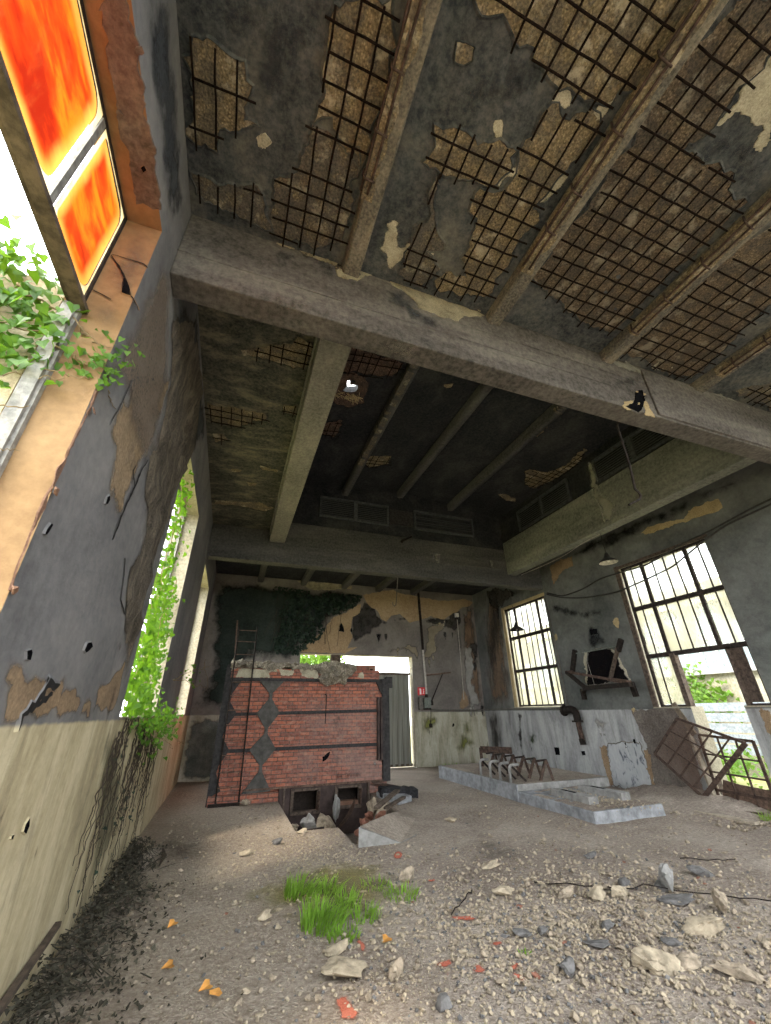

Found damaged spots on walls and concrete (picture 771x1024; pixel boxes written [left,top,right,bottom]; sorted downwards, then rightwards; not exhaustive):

spalling [180,0,423,281]
spalling [390,0,771,381]
crack [92,254,148,311]
spalling [523,448,588,489]
peeling [642,499,723,534]
peeling [298,581,352,591]
peeling [301,590,473,654]
spalling [583,647,631,686]
peeling [599,707,703,790]